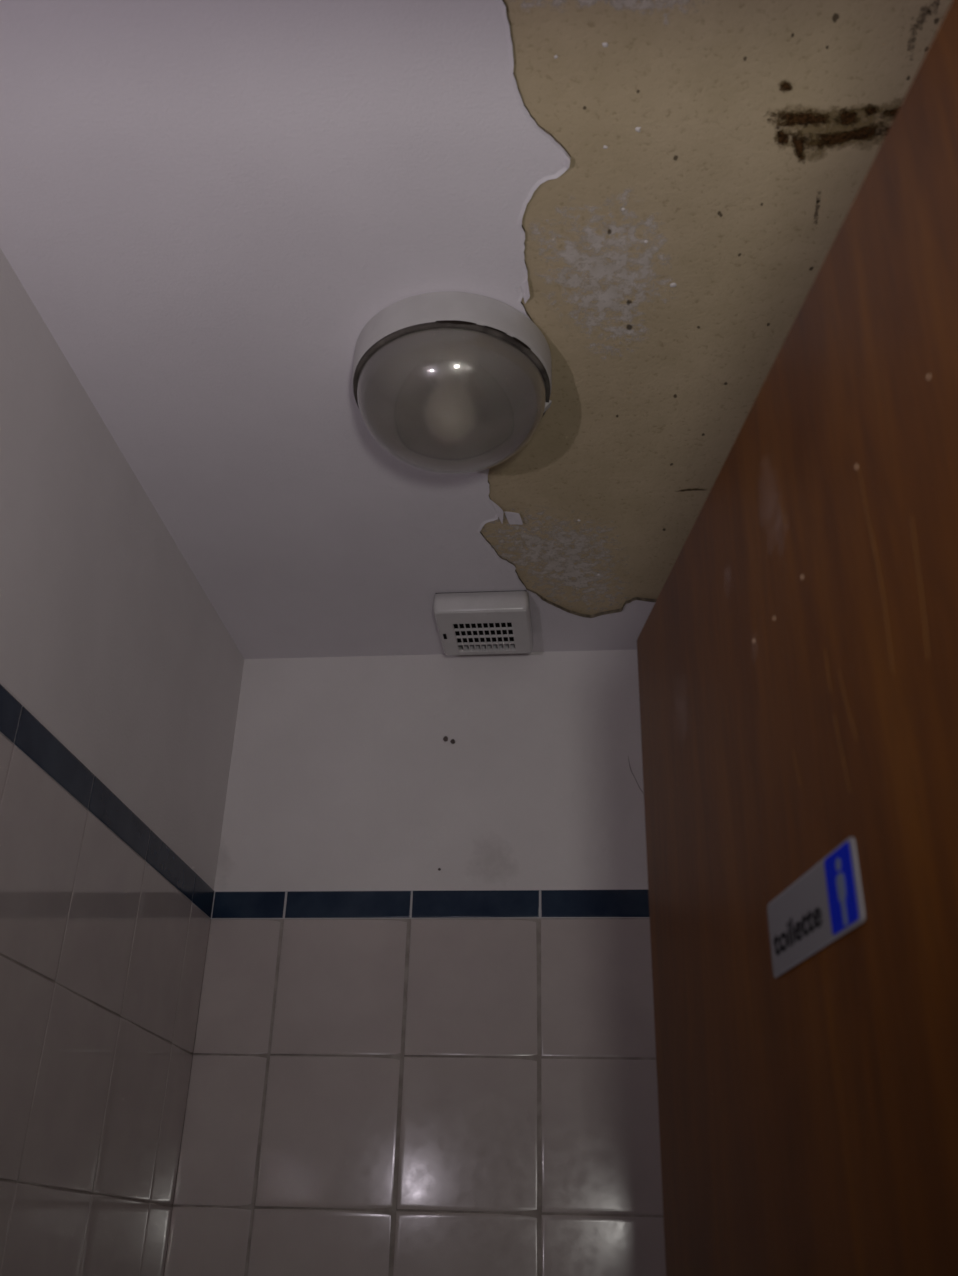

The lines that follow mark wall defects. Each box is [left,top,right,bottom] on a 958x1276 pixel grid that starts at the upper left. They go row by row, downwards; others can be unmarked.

peeling [477,0,953,618]